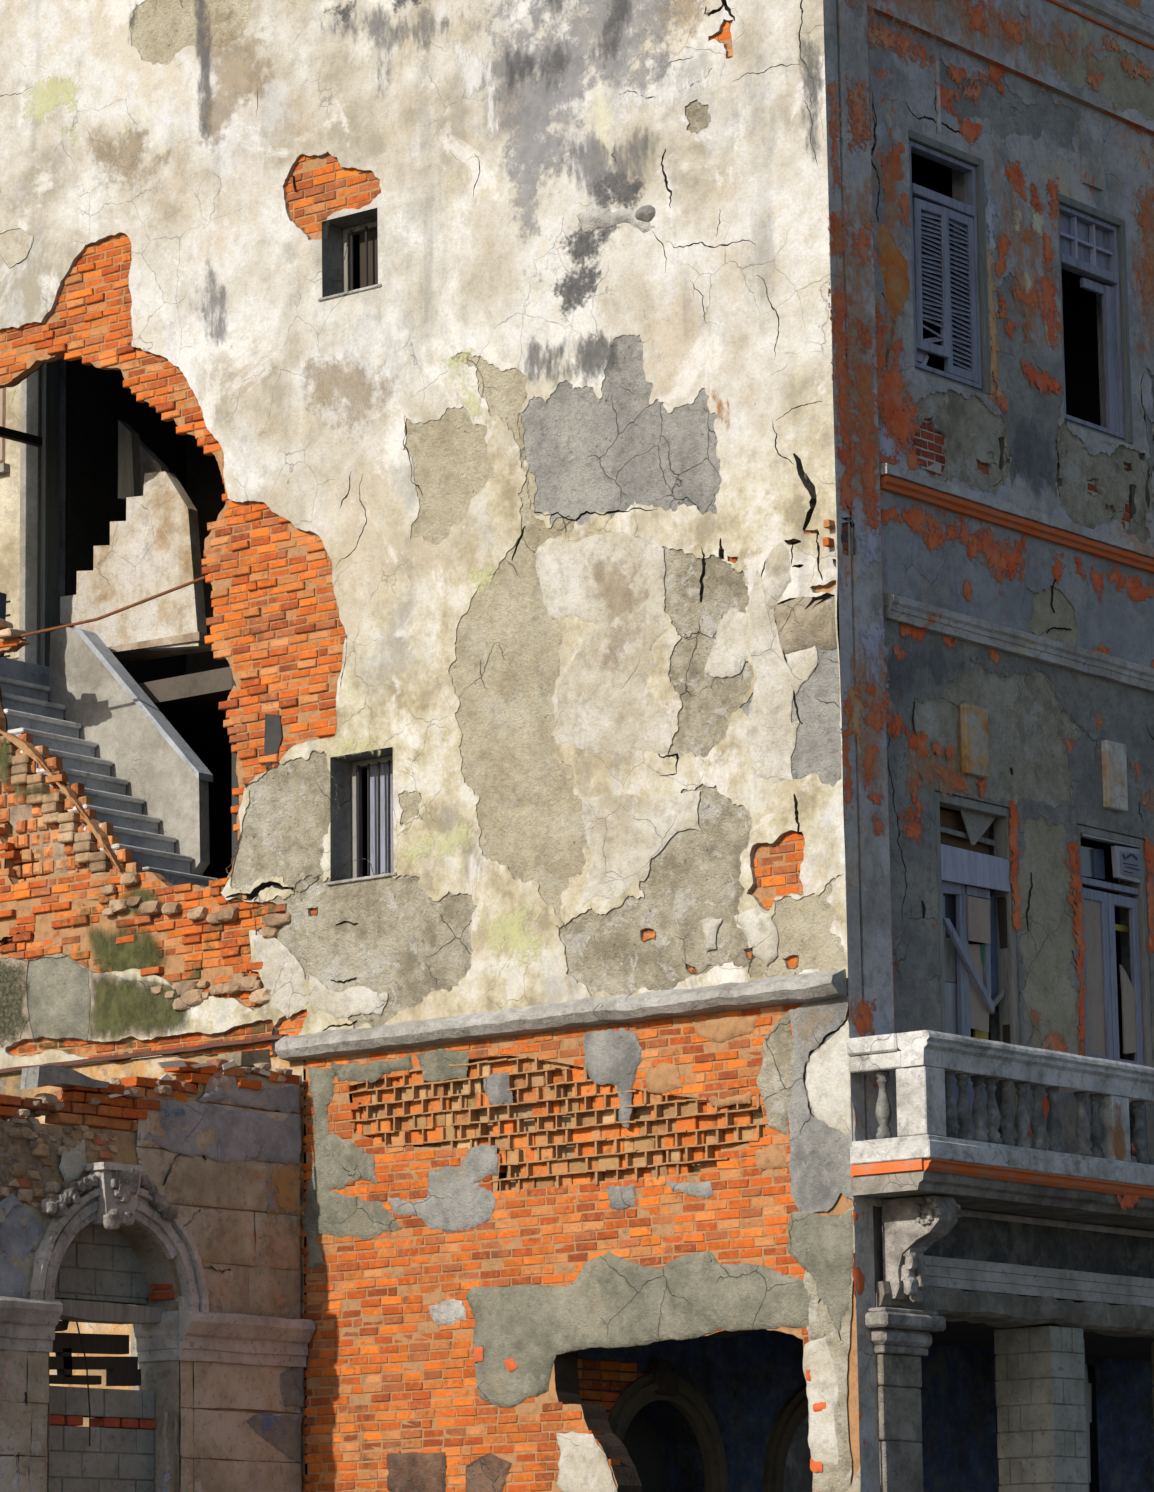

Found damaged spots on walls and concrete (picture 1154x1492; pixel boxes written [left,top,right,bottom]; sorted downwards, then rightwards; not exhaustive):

flaking render [283,151,381,240]
leakage [324,0,707,233]
leakage [554,224,619,316]
crack [620,0,818,166]
peeling [827,72,912,227]
flaking render [841,0,1077,153]
flaking render [788,160,1154,656]
flaking render [0,232,477,1063]
flaking render [403,335,846,996]
crack [699,538,724,603]
crack [761,401,854,724]
flaking render [790,603,1105,1056]